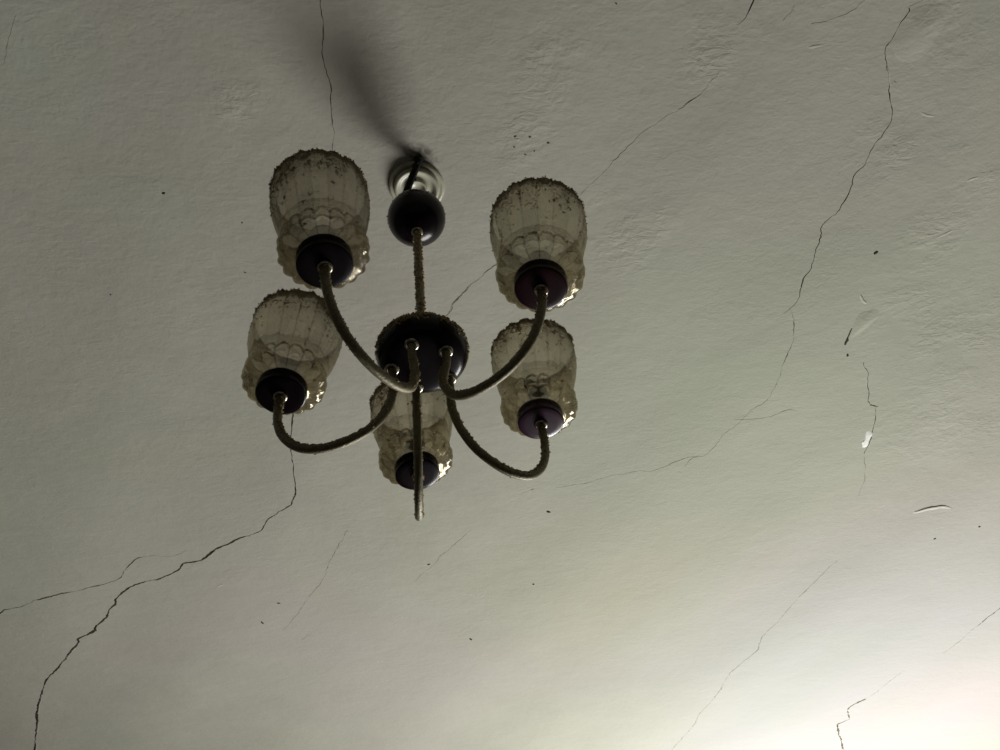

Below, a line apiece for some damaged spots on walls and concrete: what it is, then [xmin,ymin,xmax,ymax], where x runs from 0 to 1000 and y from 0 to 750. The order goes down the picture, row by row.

crack [320,0,334,151]
crack [445,261,500,317]
crack [524,0,923,497]
crack [0,413,296,750]
crack [674,561,837,747]
crack [837,675,898,750]
flaking render [913,505,951,513]